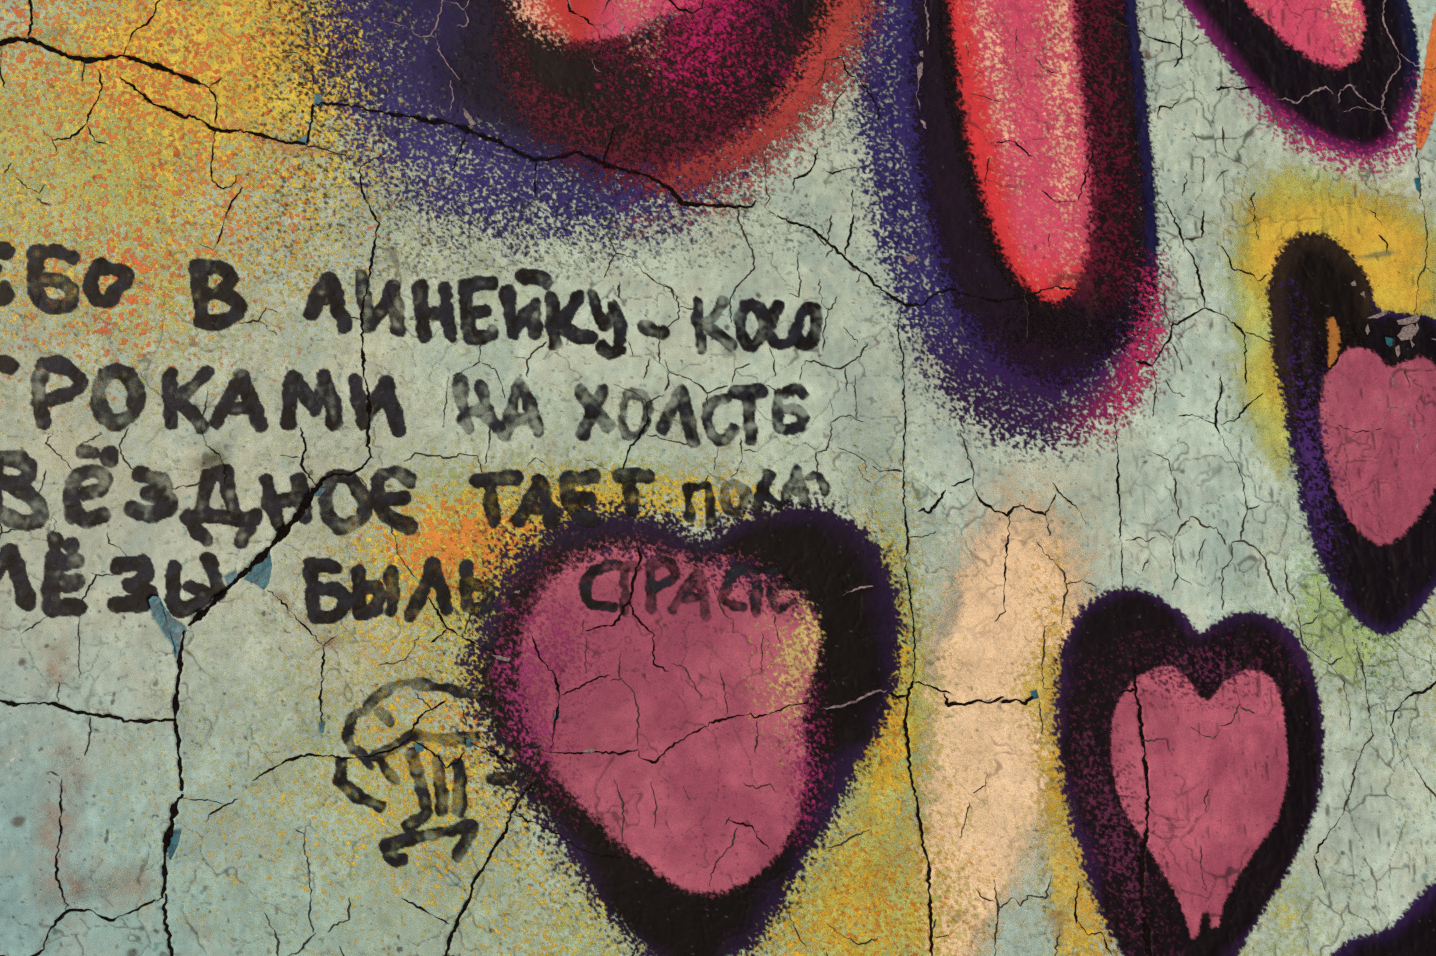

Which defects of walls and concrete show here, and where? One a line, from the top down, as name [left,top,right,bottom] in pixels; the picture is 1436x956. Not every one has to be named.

peeling [149,596,187,659]
peeling [225,551,272,590]
crack [0,0,1112,956]
crack [1119,658,1255,956]